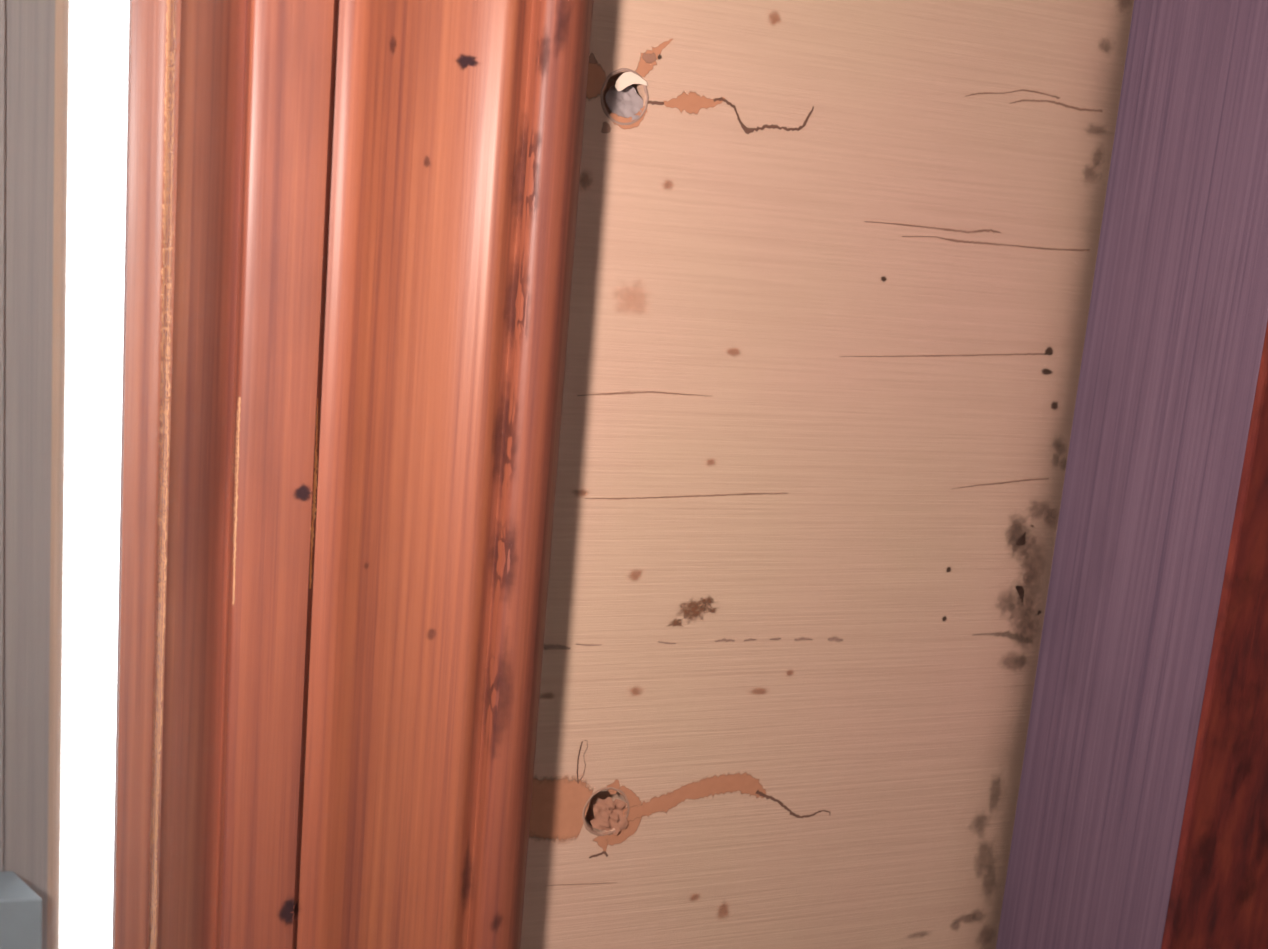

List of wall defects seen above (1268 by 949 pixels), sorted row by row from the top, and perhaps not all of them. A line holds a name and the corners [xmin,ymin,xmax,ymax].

peeling [586,38,673,99]
peeling [601,106,647,133]
crack [648,92,814,134]
flaking render [529,777,642,858]
crack [623,772,830,822]